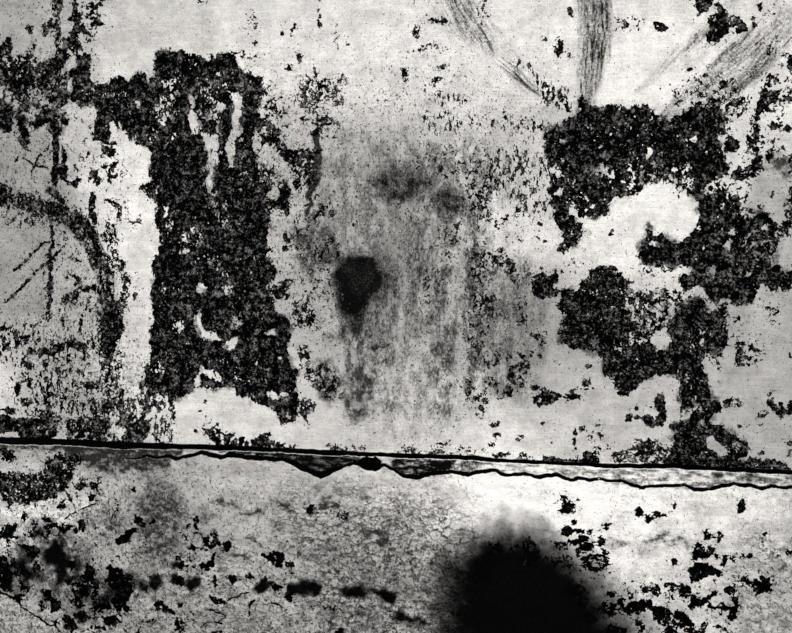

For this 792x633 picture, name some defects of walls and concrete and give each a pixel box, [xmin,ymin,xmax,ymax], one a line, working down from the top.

peeling [21,17,56,52]
peeling [693,0,748,45]
peeling [64,2,344,426]
leakage [271,54,792,489]
peeling [487,91,792,468]
leakage [201,419,376,471]
crack [0,437,792,492]
peeling [0,455,496,633]
peeling [550,488,792,633]